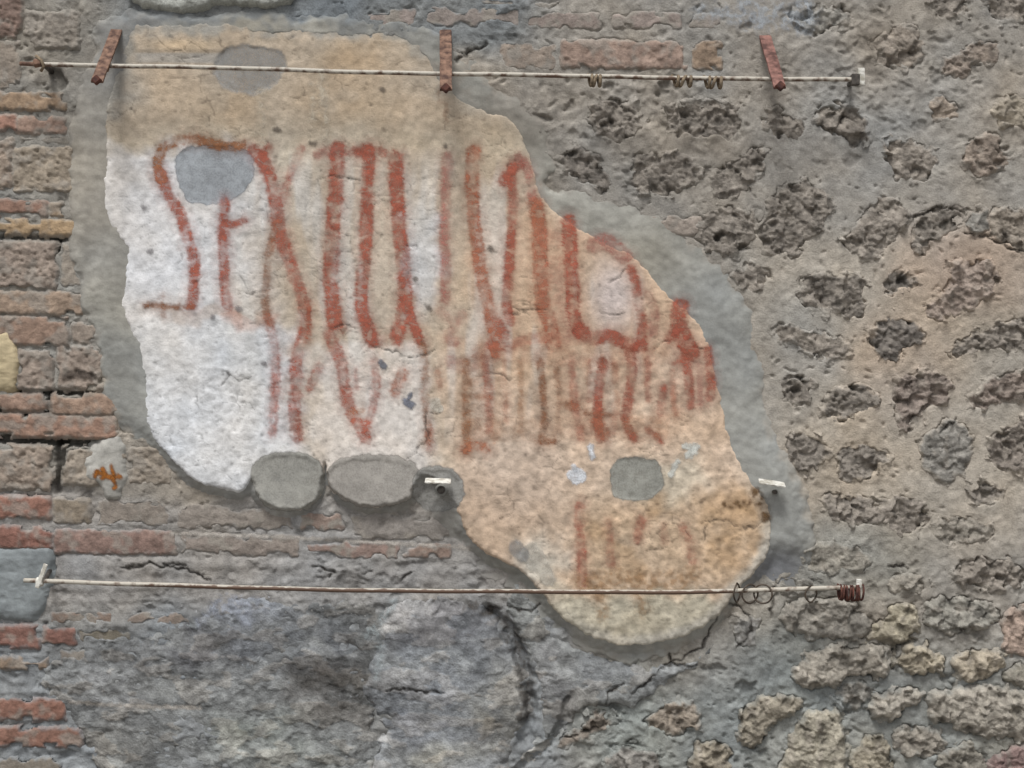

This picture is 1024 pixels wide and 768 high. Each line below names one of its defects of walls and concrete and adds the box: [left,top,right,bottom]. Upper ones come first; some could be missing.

spalling [567,464,586,484]